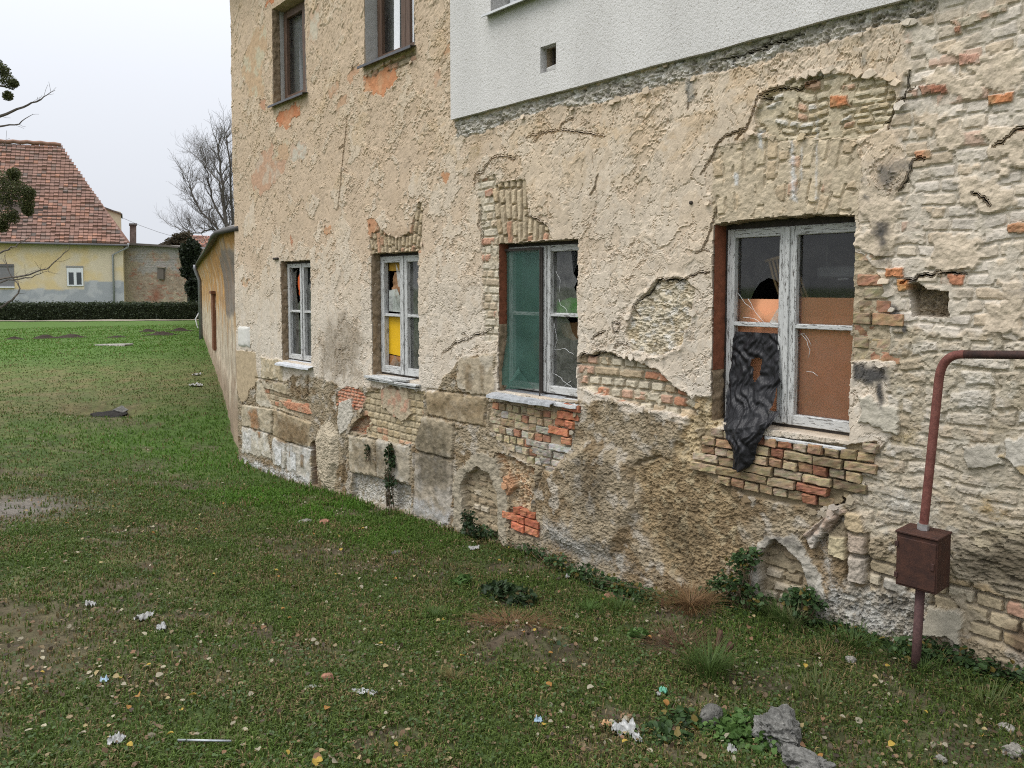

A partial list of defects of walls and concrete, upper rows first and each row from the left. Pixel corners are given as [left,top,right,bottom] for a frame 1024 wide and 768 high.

flaking render [368,200,423,254]
flaking render [486,180,551,244]
crack [474,117,605,246]
crack [701,76,824,174]
flaking render [689,64,947,225]
crack [898,156,926,191]
crack [971,191,992,206]
crack [992,126,1024,148]
spalling [579,278,702,418]
flaking render [852,251,950,368]
crack [901,270,967,284]
flaking render [489,399,581,541]